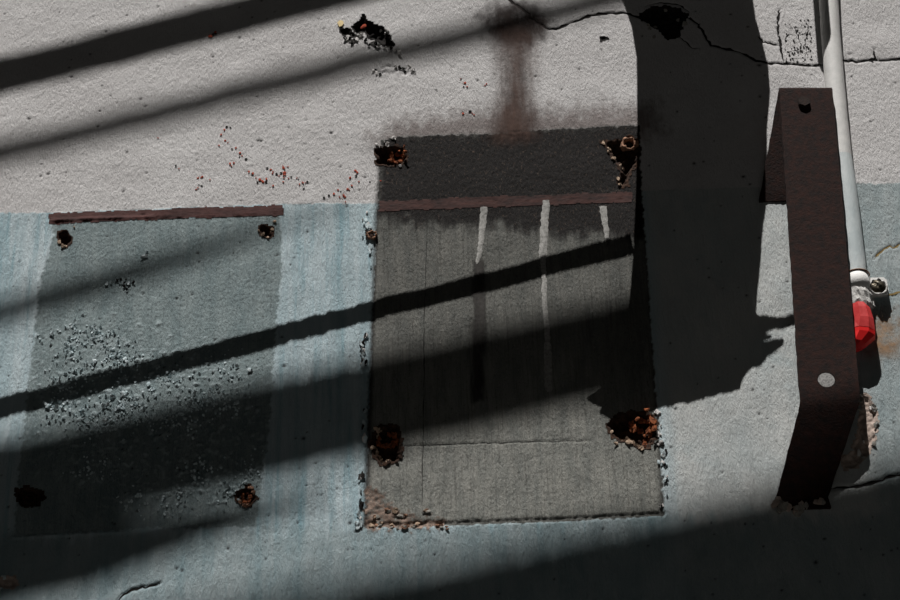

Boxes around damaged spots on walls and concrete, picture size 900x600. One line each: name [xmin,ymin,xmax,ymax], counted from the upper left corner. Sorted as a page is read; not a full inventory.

flaking render [337,14,416,73]
corrosion [486,3,548,140]
crack [508,0,900,67]
peeling [359,333,368,368]
water stain [471,260,486,403]
peeling [610,408,668,508]
peeling [355,471,449,534]